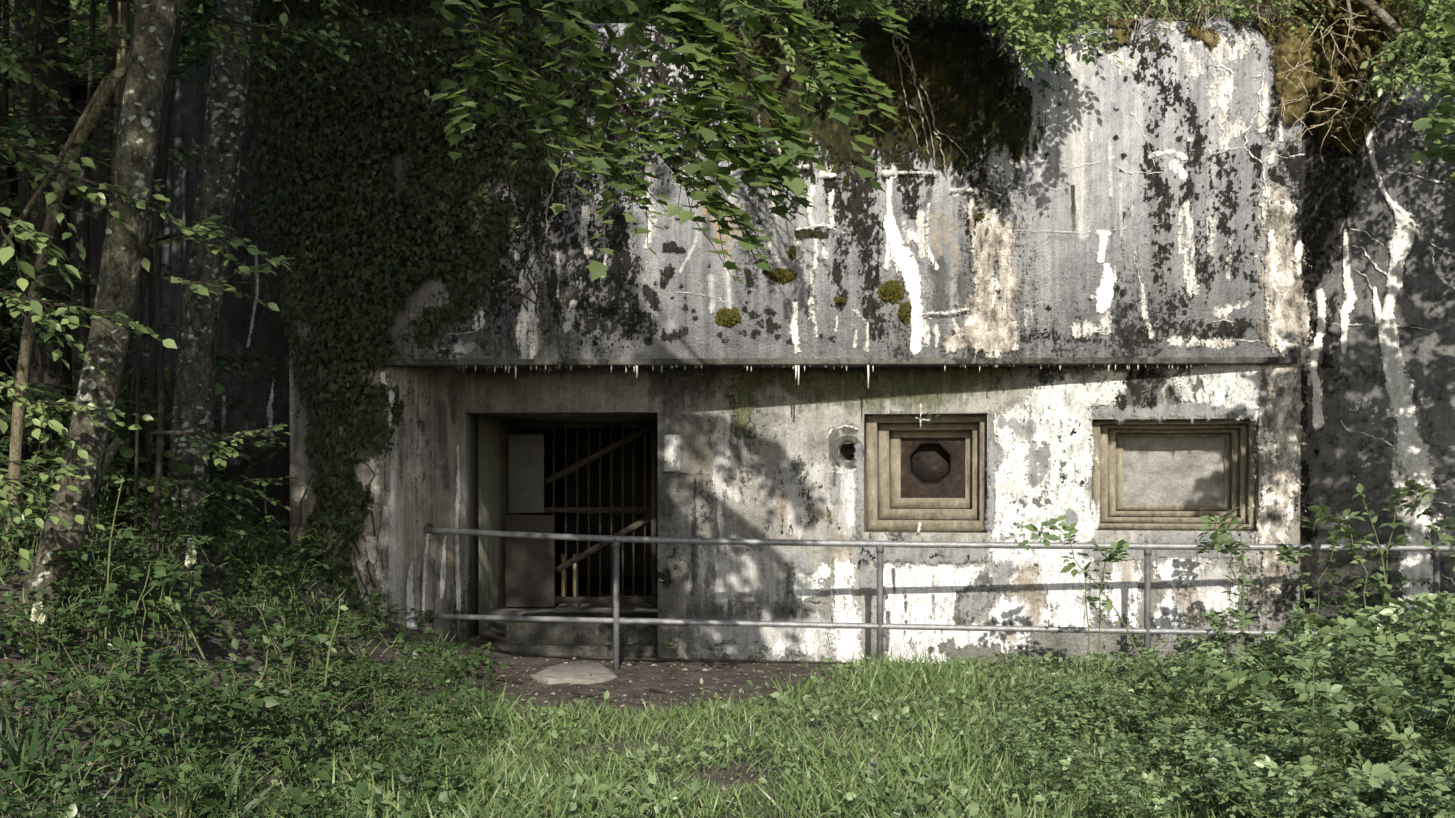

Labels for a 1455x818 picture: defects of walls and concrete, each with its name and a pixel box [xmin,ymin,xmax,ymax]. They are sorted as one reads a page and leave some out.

leakage [367,24,981,630]
peeling [713,644,737,658]
leakage [932,559,1013,625]
leakage [985,431,996,531]
peeling [759,183,1314,660]
leakage [992,19,1455,630]